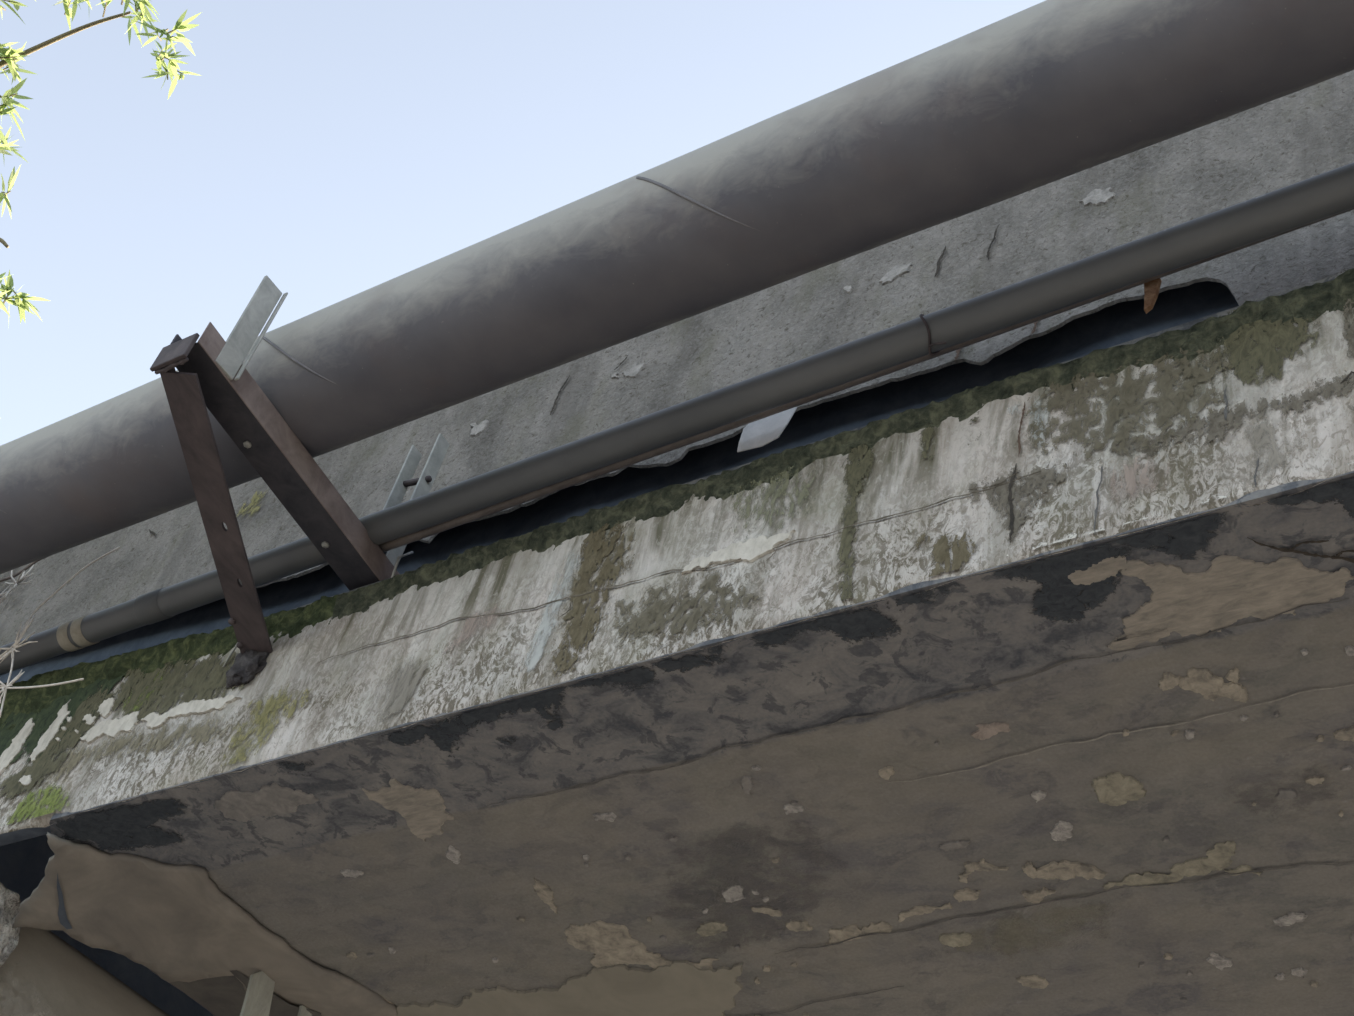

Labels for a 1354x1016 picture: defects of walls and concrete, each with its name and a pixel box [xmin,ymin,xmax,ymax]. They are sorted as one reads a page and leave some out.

damp [920,427,935,461]
damp [750,444,976,650]
crack [1247,537,1354,563]
peeling [1068,555,1354,651]
peeling [1158,667,1248,703]
damp [0,685,232,801]
peeling [1091,772,1147,806]
damp [56,799,187,852]
spalling [564,920,673,968]